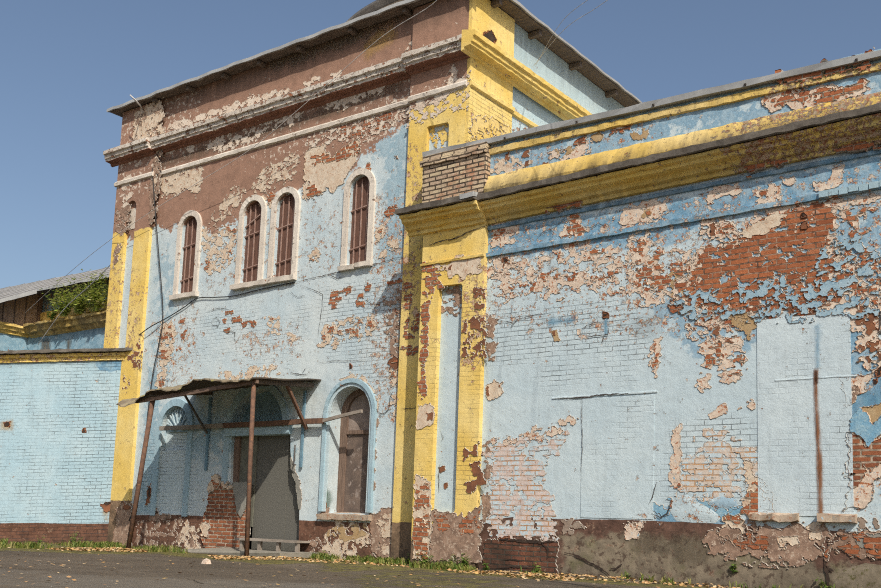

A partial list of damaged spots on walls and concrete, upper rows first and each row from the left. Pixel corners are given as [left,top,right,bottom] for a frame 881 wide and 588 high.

flaking render [132,87,291,141]
spalling [761,46,875,113]
peeling [112,160,141,269]
peeling [148,149,204,225]
flaking render [186,64,529,276]
spalling [154,317,188,388]
flaking render [218,363,281,380]
spalling [222,310,297,342]
spalling [308,141,881,574]
rust [814,370,823,513]
spalling [100,474,251,549]